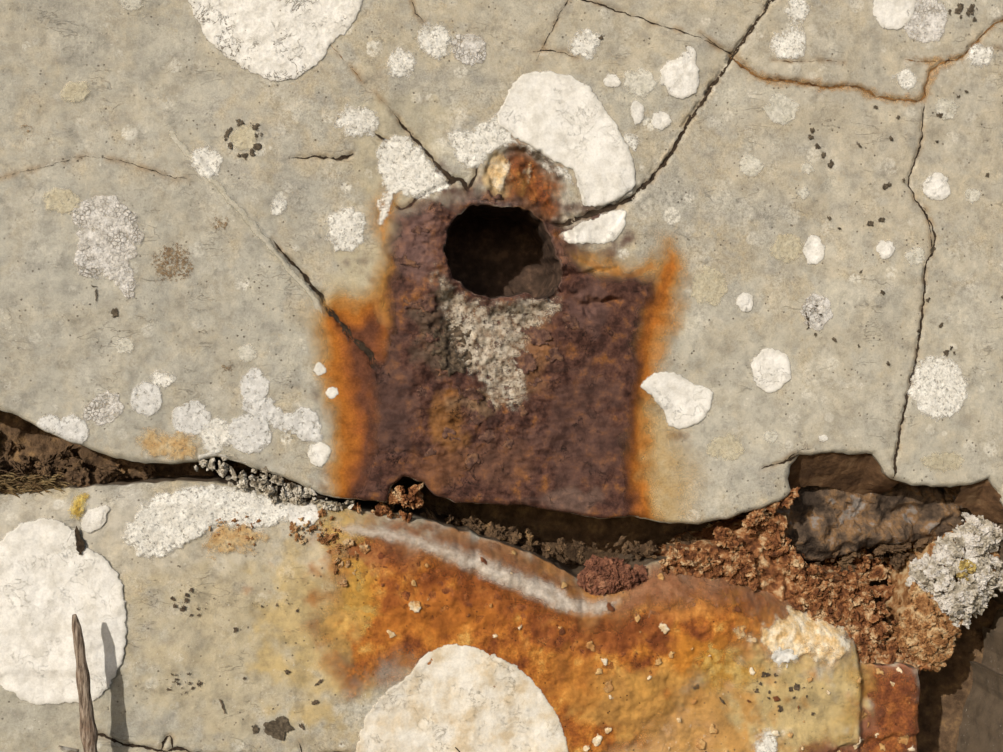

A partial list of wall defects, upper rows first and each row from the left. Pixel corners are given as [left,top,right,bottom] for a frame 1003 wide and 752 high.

crack [295,153,353,161]
crack [373,114,478,210]
crack [534,0,1003,478]
crack [274,241,378,369]
corrosion [319,152,683,522]
spalling [788,452,900,495]
spalling [954,479,1003,524]
corrosion [319,515,794,752]
spalling [734,605,850,668]
corrosion [853,667,920,752]